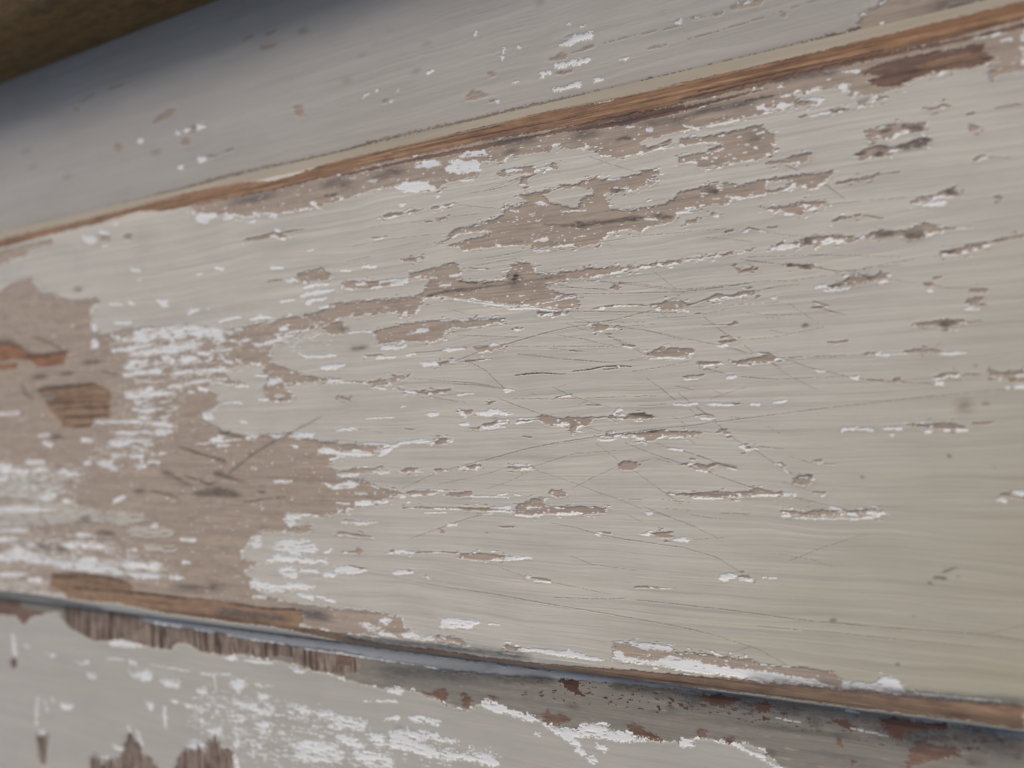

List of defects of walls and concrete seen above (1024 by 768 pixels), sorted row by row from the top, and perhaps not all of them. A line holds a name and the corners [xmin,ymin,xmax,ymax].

peeling [846,0,984,33]
peeling [0,20,1024,481]
crack [515,364,631,376]
peeling [0,489,75,513]
peeling [668,459,889,520]
peeling [0,513,1024,768]